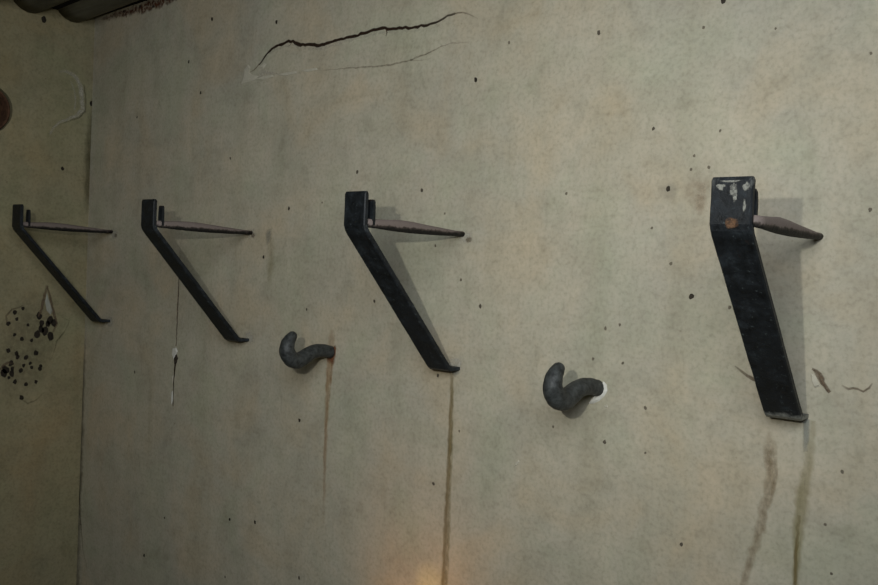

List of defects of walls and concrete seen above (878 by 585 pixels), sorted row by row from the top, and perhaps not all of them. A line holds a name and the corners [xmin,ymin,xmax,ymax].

crack [258,12,462,65]